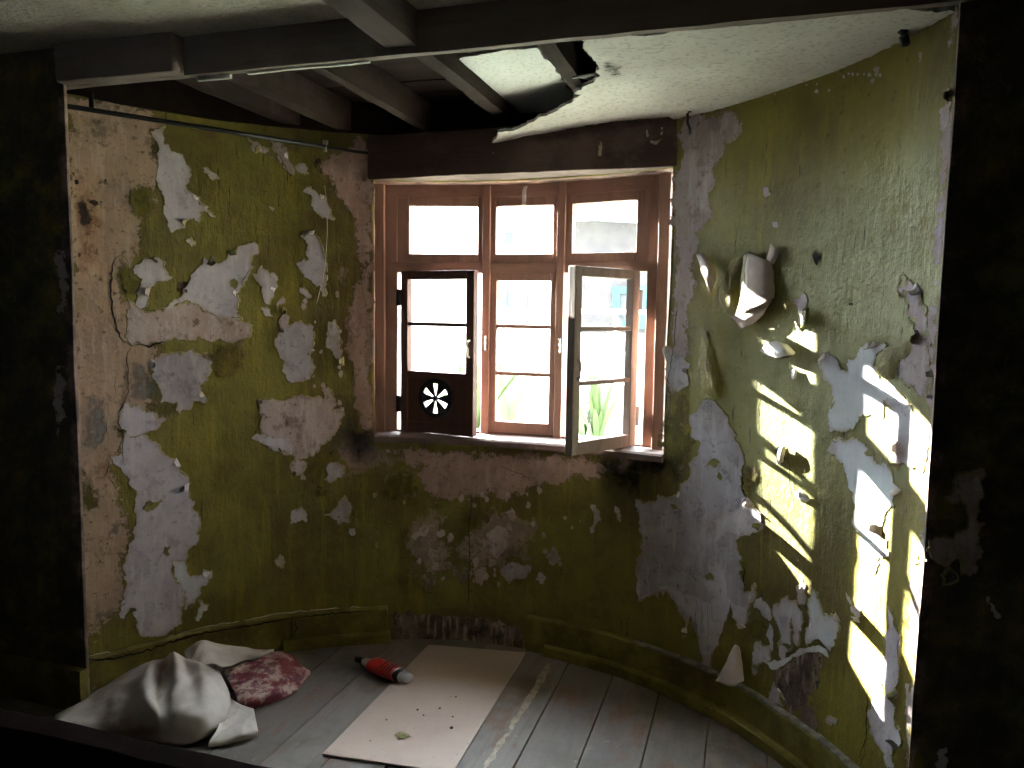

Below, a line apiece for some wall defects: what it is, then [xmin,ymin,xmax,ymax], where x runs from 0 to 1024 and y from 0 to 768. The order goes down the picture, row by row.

flaking render [52,95,636,656]
flaking render [662,109,743,401]
peeling [635,398,862,732]
peeling [817,87,953,575]